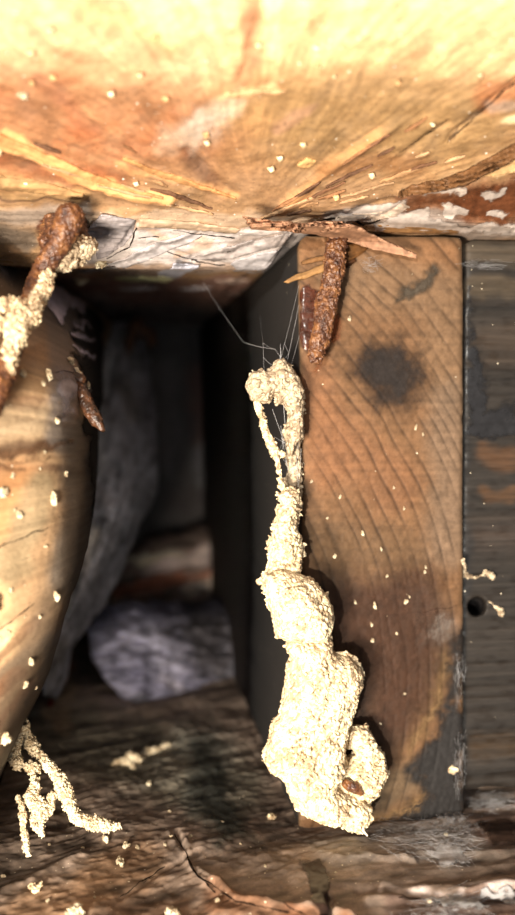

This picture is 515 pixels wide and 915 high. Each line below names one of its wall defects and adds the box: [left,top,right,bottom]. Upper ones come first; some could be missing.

rust [299,285,319,351]
rust [331,315,339,341]
damp [353,345,425,405]